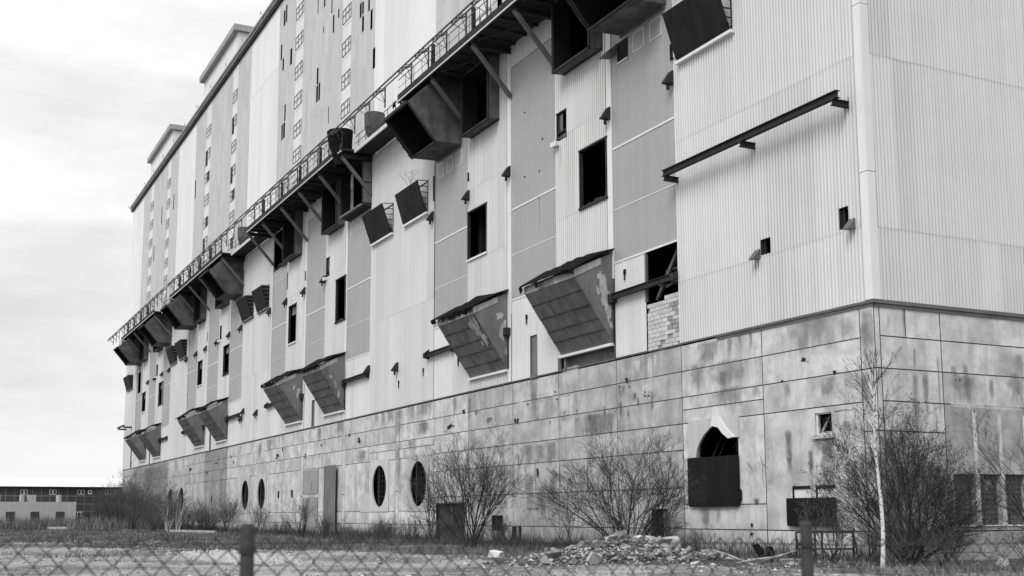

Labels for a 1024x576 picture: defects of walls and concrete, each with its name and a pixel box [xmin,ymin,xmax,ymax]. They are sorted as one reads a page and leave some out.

peeling [596,270,613,329]
peeling [468,312,507,355]